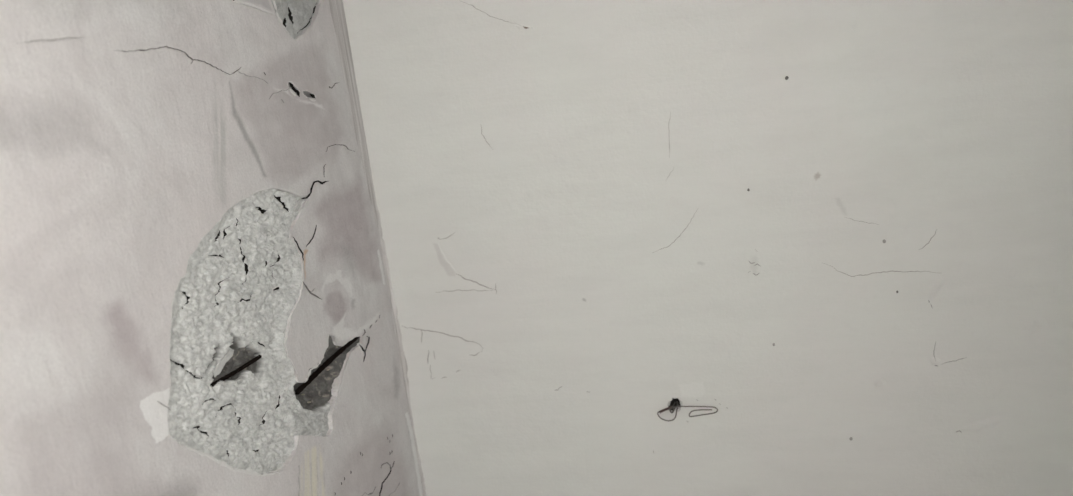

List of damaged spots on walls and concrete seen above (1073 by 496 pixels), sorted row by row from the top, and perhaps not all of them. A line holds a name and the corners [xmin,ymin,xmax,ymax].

spalling [233,0,320,39]
crack [115,46,290,103]
crack [301,144,355,199]
crack [293,225,321,299]
spalling [167,188,364,476]
crack [362,462,400,496]